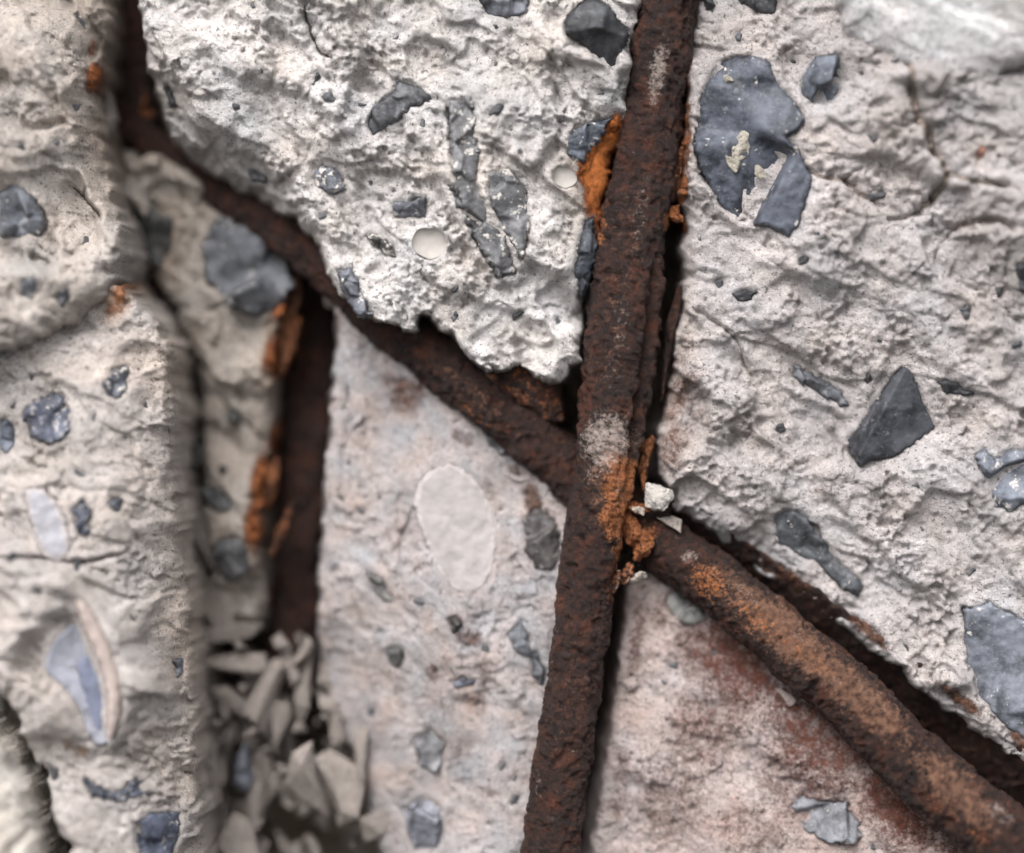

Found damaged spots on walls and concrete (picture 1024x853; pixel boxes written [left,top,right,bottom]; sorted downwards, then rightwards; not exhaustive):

rust [576,111,623,234]
rust [667,83,691,237]
rust [243,418,283,552]
rust [261,293,289,380]
spalling [103,0,577,853]
rust [471,363,572,429]
rust [509,465,546,512]
spalling [520,0,1024,853]
rust [665,499,1024,807]